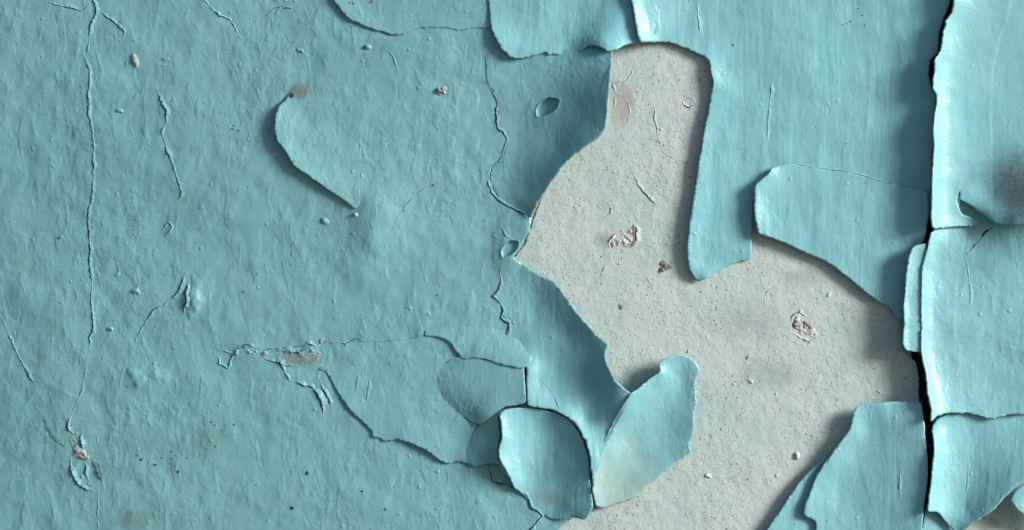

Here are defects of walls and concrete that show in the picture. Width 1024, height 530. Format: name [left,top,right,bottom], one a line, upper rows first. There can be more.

crack [929,0,981,96]
crack [47,0,126,416]
crack [150,73,185,202]
crack [486,81,530,336]
peeling [217,0,1024,530]
crack [229,335,424,416]
crack [899,351,934,518]